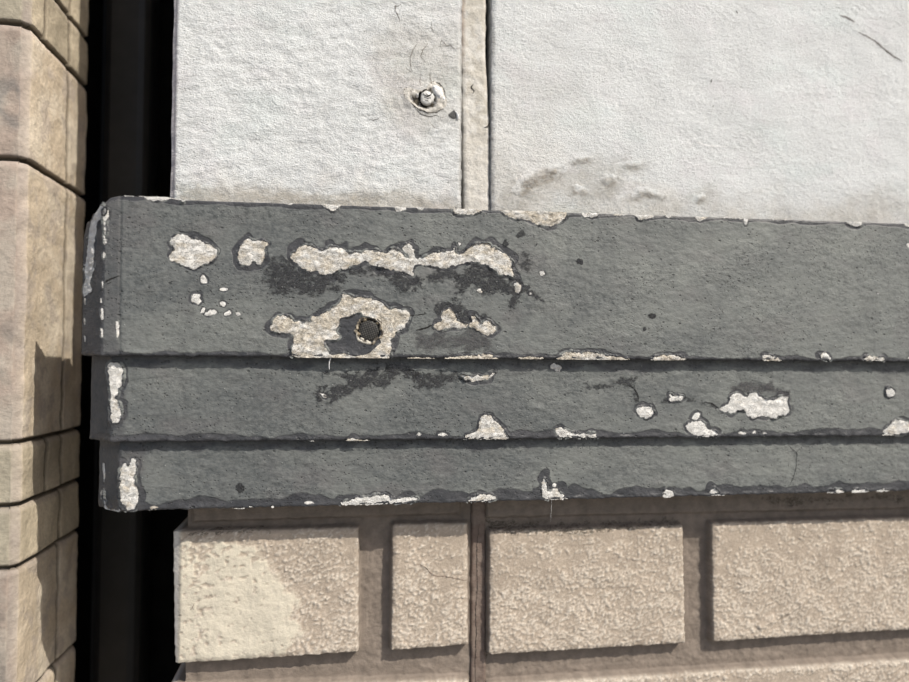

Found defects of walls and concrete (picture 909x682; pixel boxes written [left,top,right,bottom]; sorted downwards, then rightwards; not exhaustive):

peeling [168,232,241,317]
peeling [236,236,270,268]
peeling [289,241,533,296]
peeling [268,292,412,359]
peeling [431,307,497,338]
peeling [105,359,126,425]
peeling [463,412,510,440]
peeling [718,390,791,435]
peeling [880,417,909,436]
peeling [100,457,141,513]
peeling [339,492,420,506]
peeling [539,476,568,502]